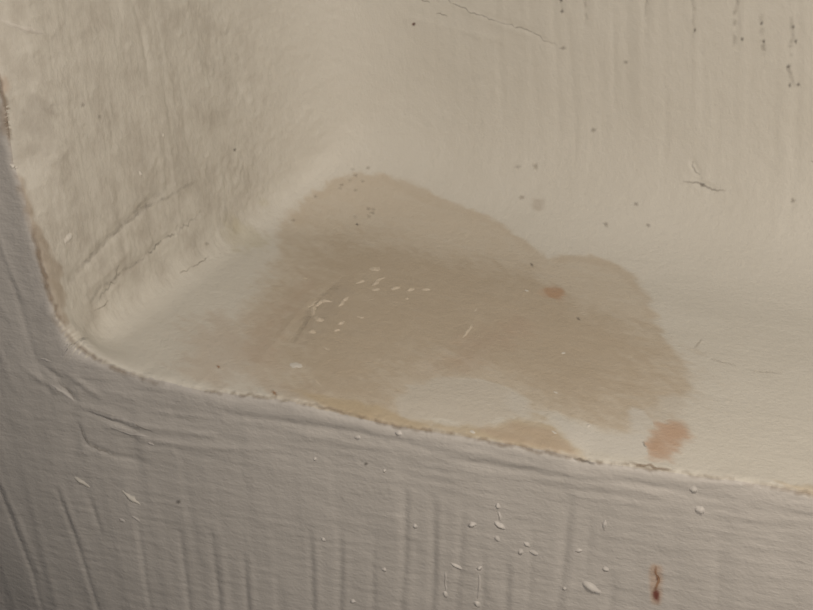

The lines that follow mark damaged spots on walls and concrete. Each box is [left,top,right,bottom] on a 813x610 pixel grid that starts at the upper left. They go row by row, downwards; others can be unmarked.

water stain [137,167,742,462]
peeling [542,388,691,461]
corrosion [645,561,666,609]